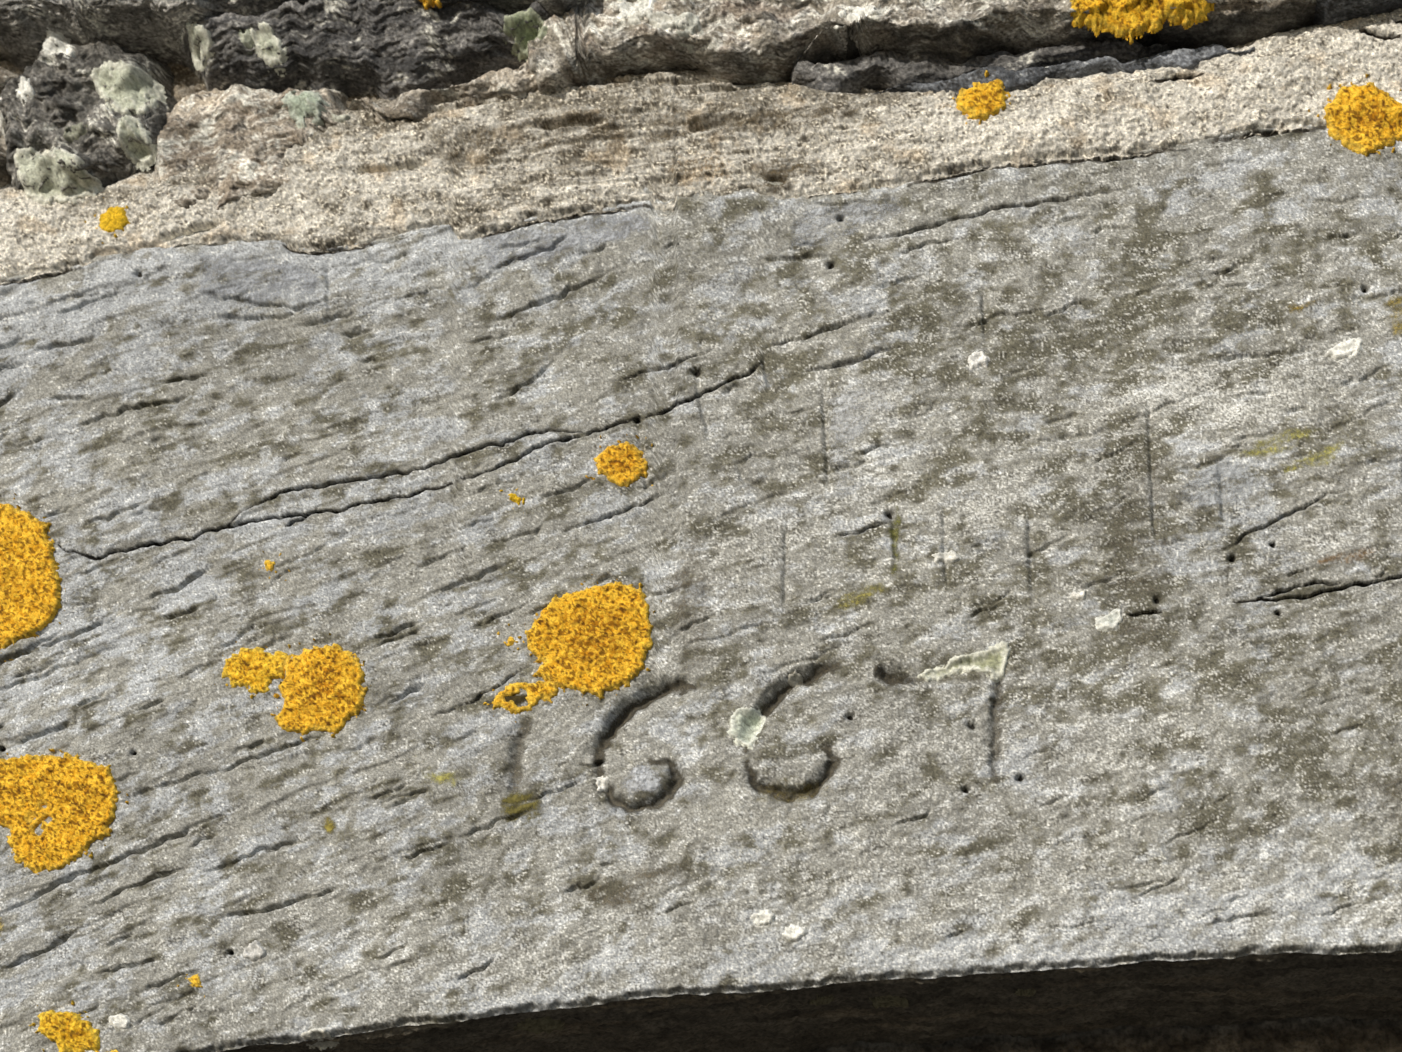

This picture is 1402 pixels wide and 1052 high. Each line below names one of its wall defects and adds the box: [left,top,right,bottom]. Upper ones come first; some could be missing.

crack [1233,577,1402,603]
crack [1128,610,1162,618]